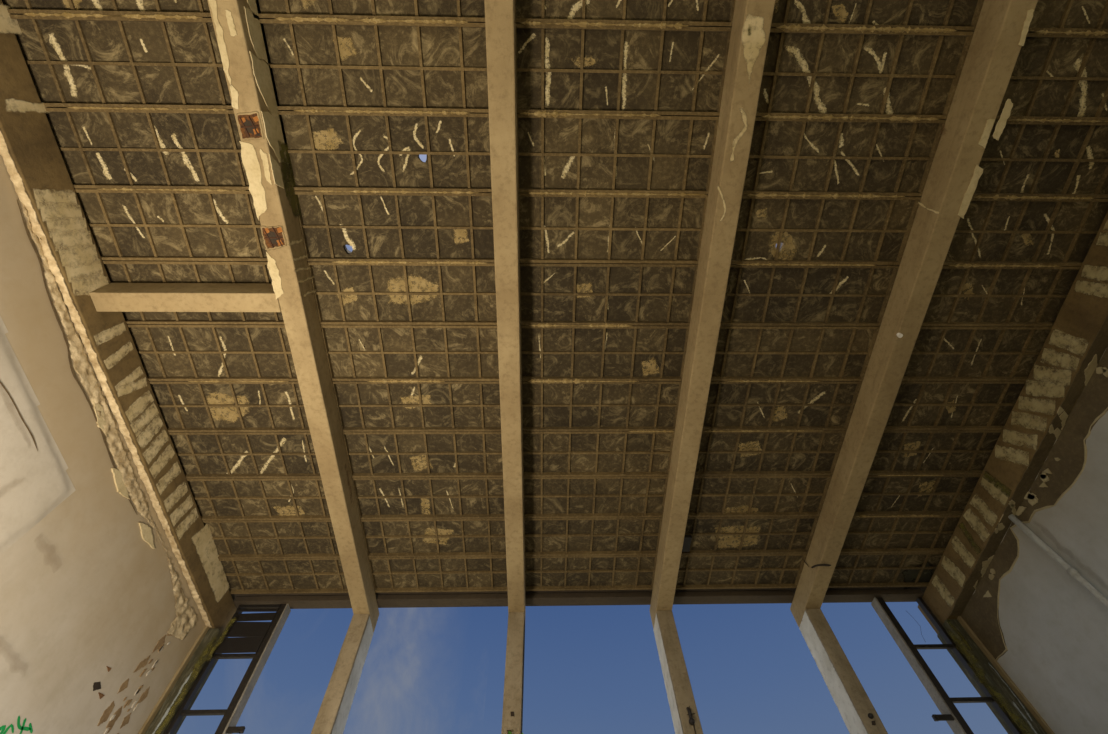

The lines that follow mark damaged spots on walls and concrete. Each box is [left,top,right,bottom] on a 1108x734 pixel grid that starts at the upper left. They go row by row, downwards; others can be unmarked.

peeling [208,0,287,299]
peeling [958,165,983,219]
peeling [978,99,1013,148]
peeling [1018,9,1034,46]
peeling [0,131,212,734]
peeling [950,314,1108,661]